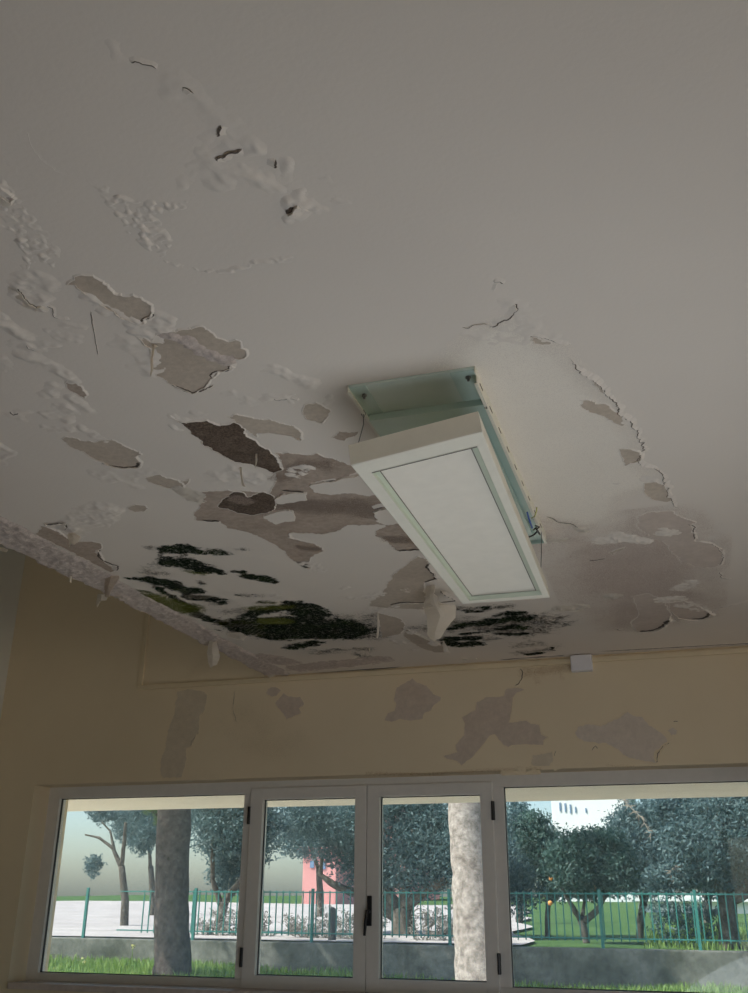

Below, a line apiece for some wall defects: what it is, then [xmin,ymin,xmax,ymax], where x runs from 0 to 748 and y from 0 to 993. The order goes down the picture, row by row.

peeling [64,380,89,398]
peeling [61,436,191,489]
peeling [170,402,456,653]